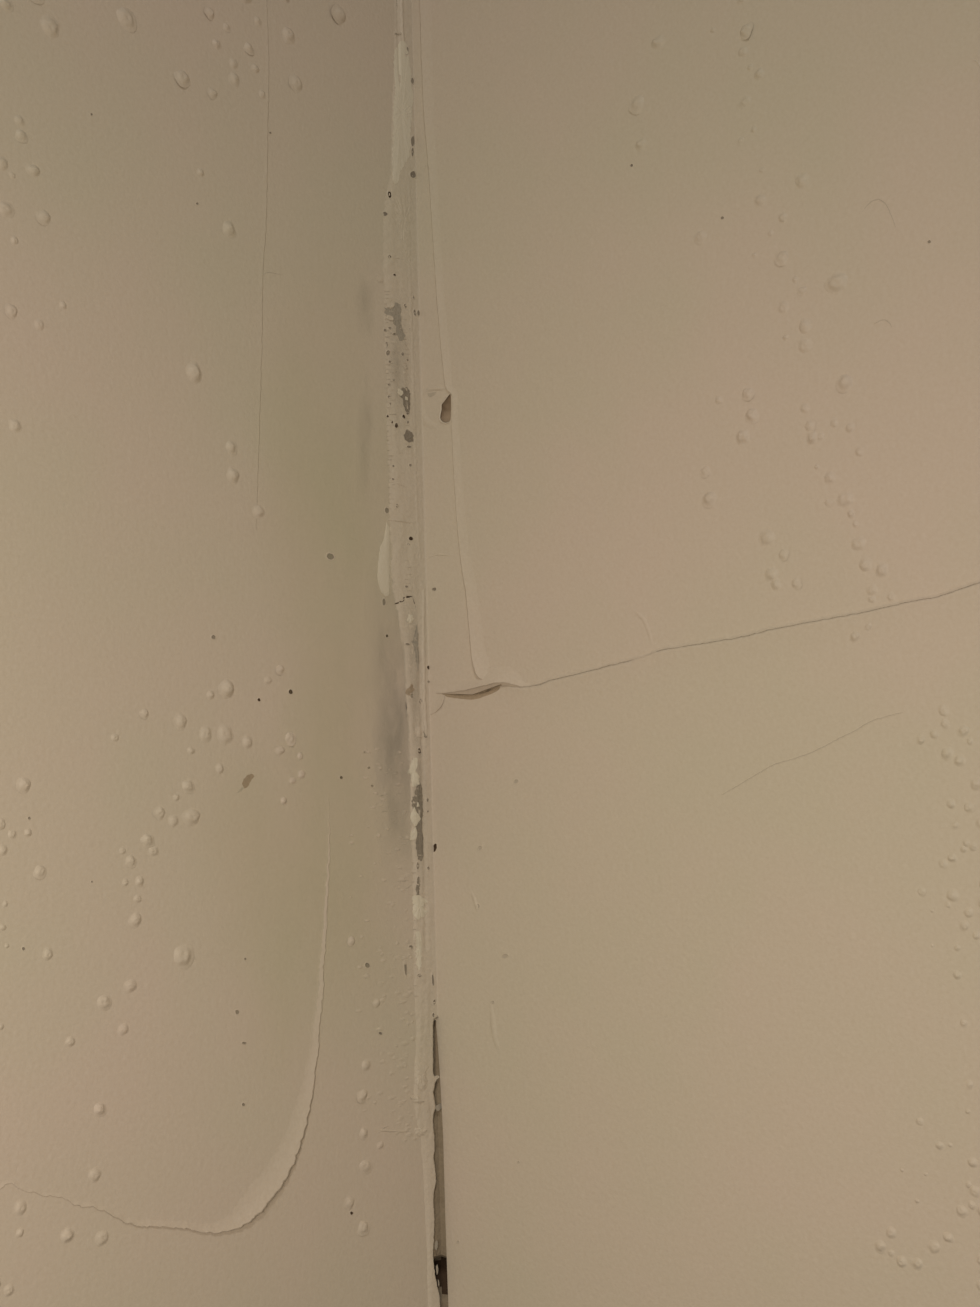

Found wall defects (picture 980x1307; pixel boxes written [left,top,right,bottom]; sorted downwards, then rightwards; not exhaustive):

peeling [392,41,414,252]
spalling [384,302,405,341]
spalling [398,387,414,442]
spalling [407,758,424,861]
peeling [412,879,428,970]
crack [433,1020,448,1307]